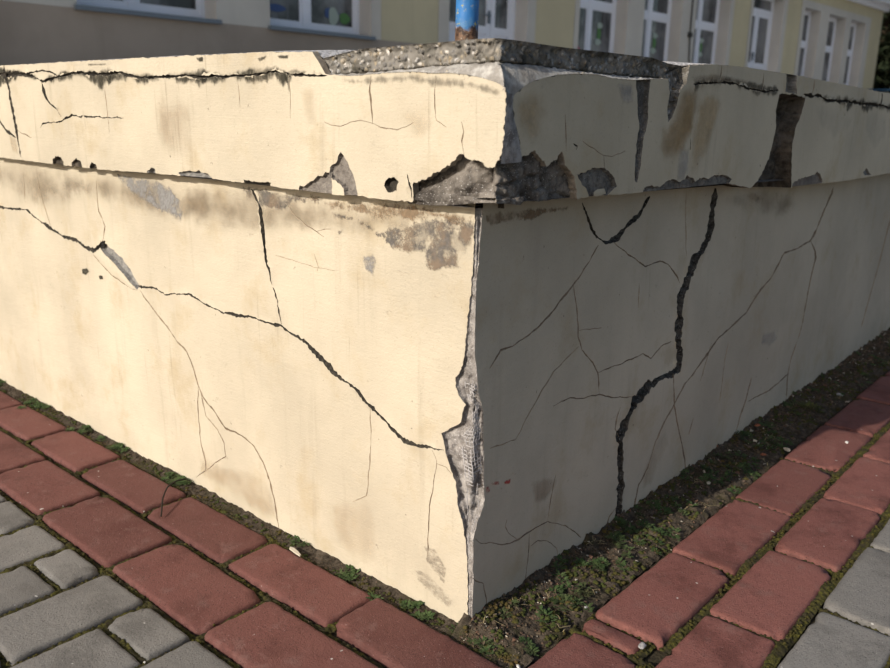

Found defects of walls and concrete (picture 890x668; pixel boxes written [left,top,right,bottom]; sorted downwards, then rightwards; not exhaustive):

crack [0,67,327,253]
spalling [315,38,689,122]
spalling [643,175,732,192]
crack [804,80,890,111]
crack [139,189,451,557]
spalling [299,152,617,617]
crack [490,79,834,522]